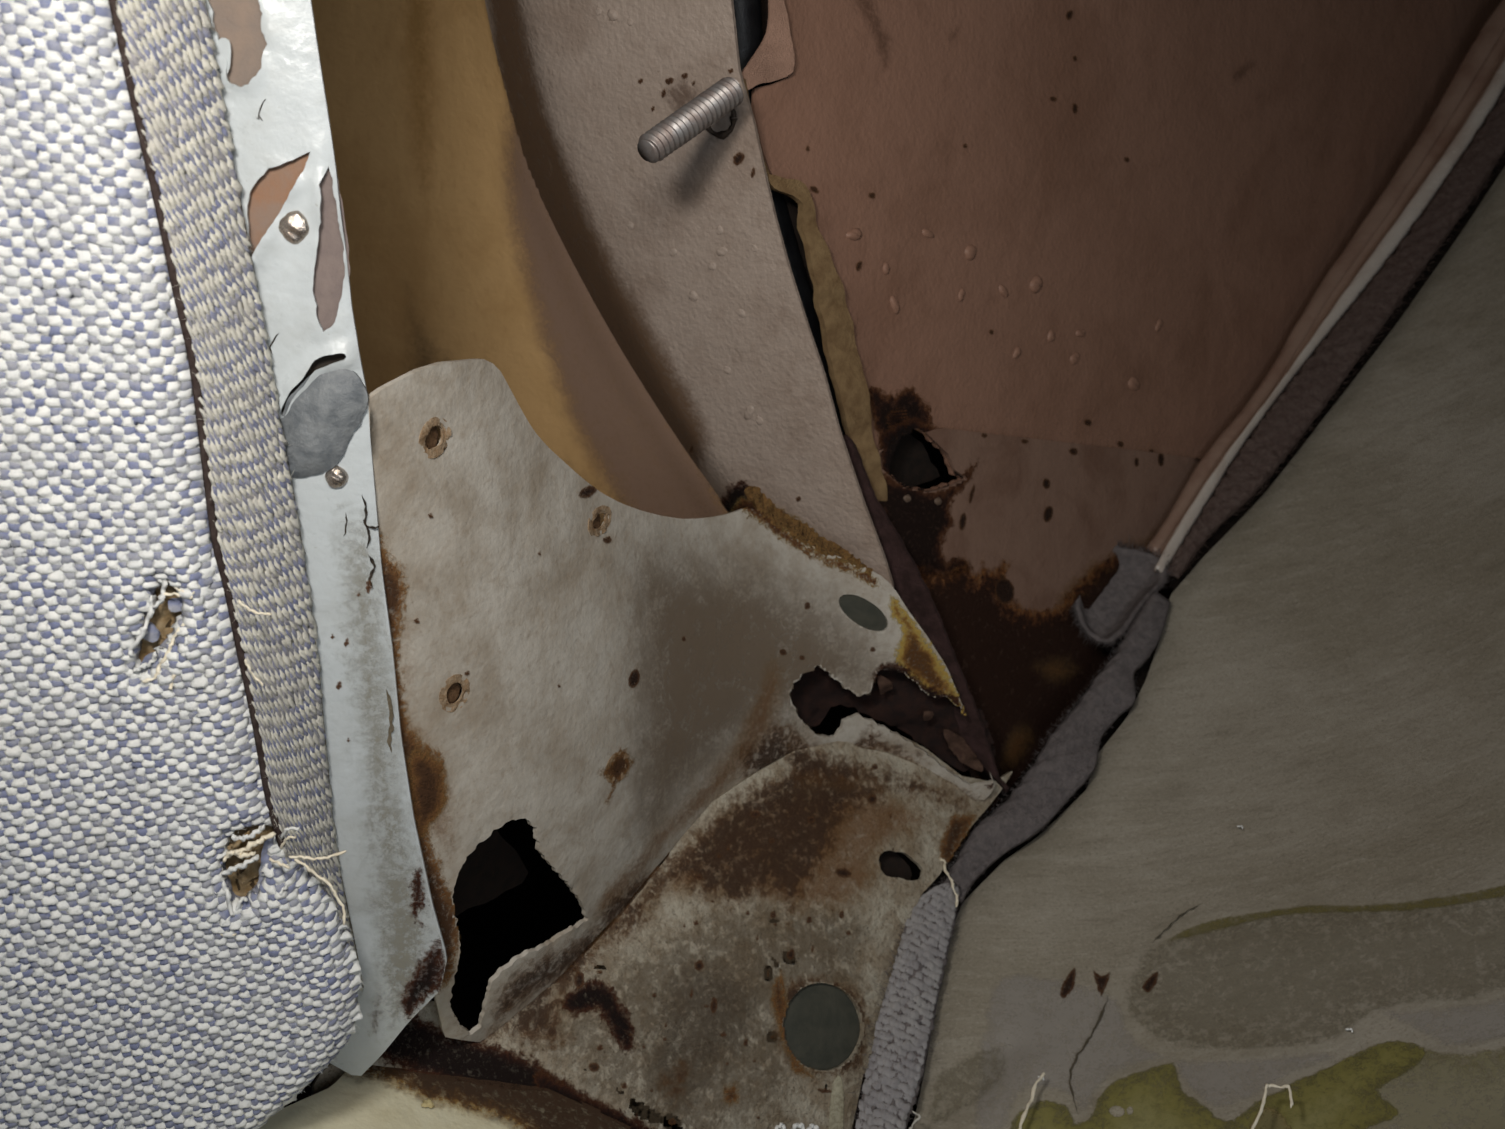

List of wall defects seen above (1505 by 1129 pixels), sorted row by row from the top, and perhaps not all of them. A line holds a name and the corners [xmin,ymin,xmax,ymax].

peeling [209,0,267,87]
peeling [248,152,310,255]
peeling [314,168,350,331]
corrosion [1157,576,1174,600]
corrosion [344,386,1148,1129]
leakage [1177,886,1505,938]
crack [1069,994,1109,1115]
leakage [978,978,1505,1129]